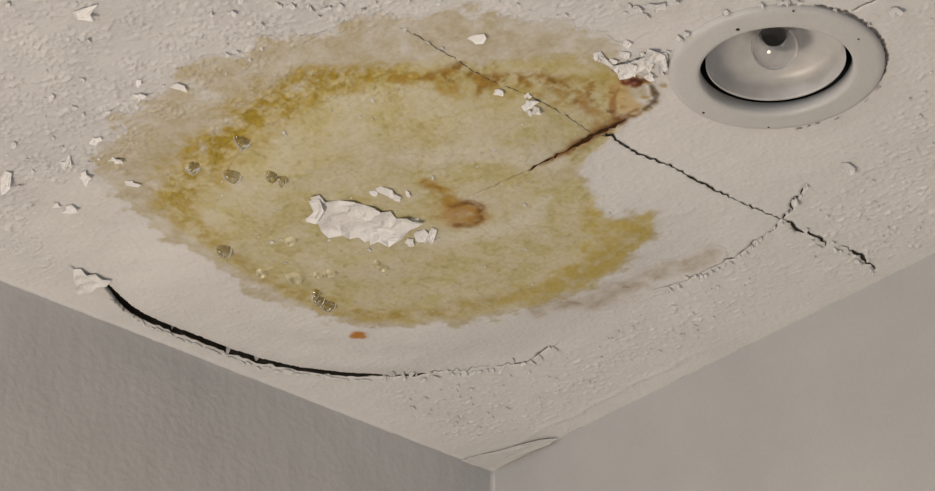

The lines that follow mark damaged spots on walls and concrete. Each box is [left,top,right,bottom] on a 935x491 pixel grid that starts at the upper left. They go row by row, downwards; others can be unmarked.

peeling [592,40,671,82]
peeling [306,186,439,252]
water stain [82,2,728,340]
rust [419,177,491,229]
crack [393,24,875,294]
peeling [68,265,110,295]
crack [107,285,559,383]